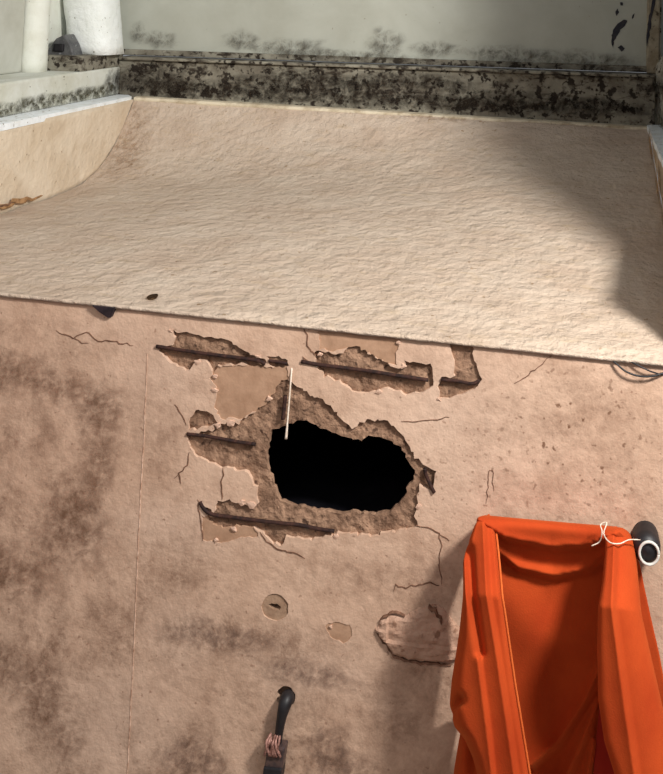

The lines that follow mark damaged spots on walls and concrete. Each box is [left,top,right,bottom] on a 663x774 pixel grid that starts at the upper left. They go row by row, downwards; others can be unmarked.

water stain [0,67,642,115]
crack [56,330,133,346]
spalling [301,331,482,401]
spalling [156,329,436,544]
crack [394,525,449,589]